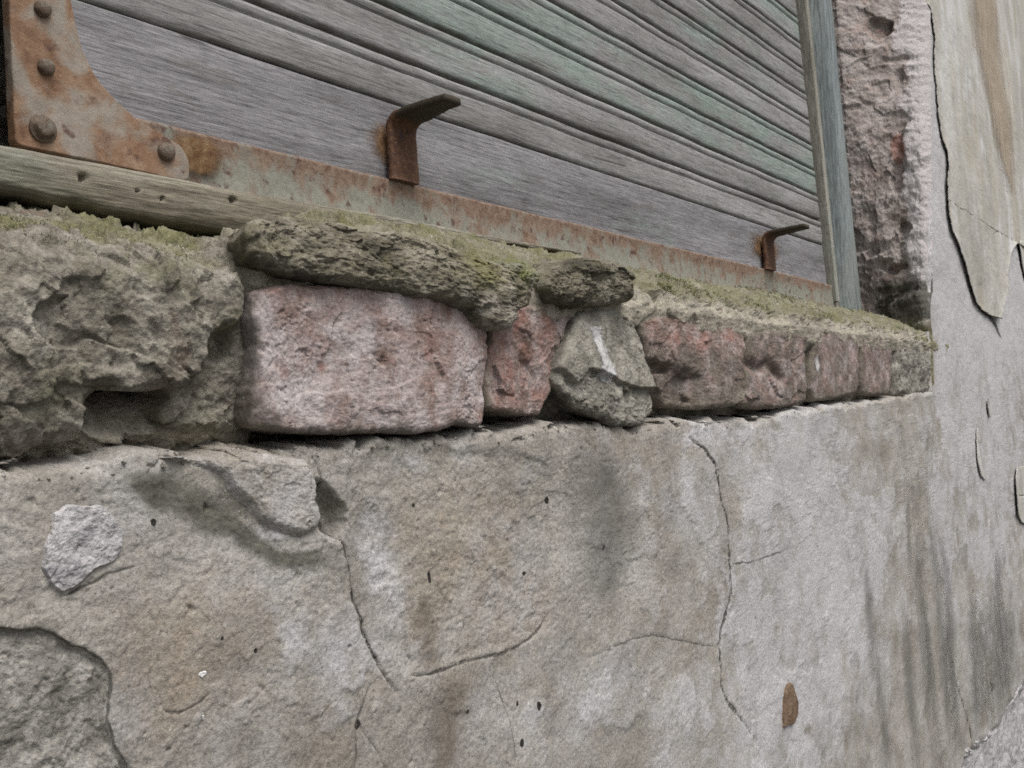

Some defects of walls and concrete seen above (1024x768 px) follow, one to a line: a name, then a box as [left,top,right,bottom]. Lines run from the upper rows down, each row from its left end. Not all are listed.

rust [376,124,388,163]
peeling [926,0,1024,336]
peeling [1015,466,1024,523]
spalling [0,627,127,768]
crack [318,522,387,761]
crack [413,624,542,676]
crack [599,442,786,740]